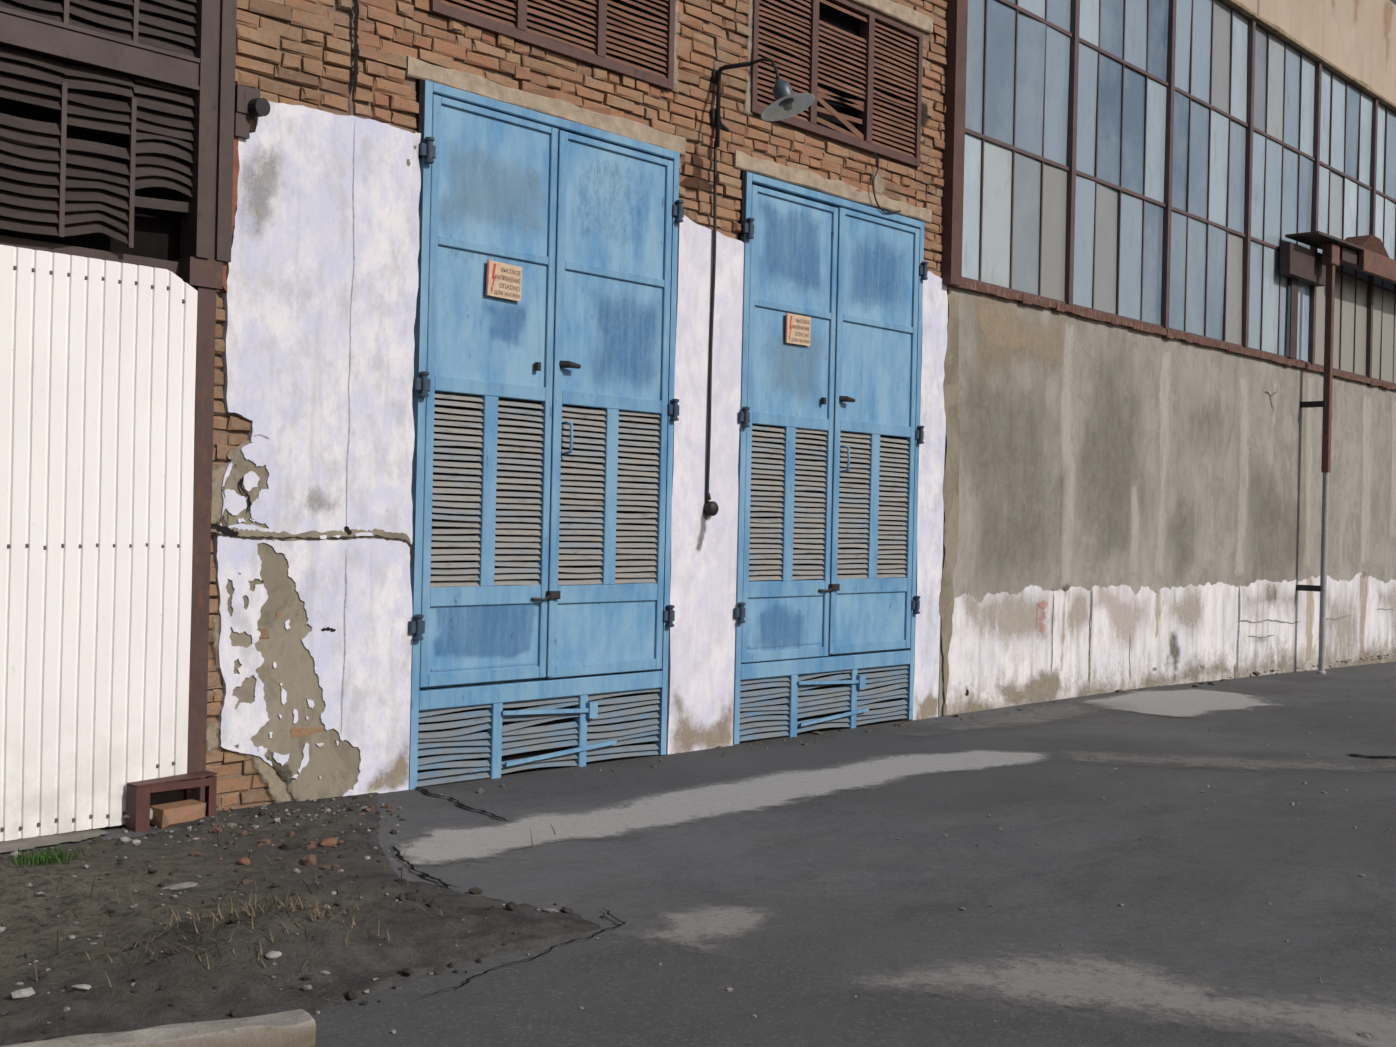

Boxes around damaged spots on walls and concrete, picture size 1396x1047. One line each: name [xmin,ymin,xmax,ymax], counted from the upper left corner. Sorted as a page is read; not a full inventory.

damp [976,299,1171,586]
damp [1234,376,1313,576]
damp [1360,394,1372,565]
peeling [206,440,360,803]
peeling [1070,589,1140,642]
peeling [1174,595,1200,627]